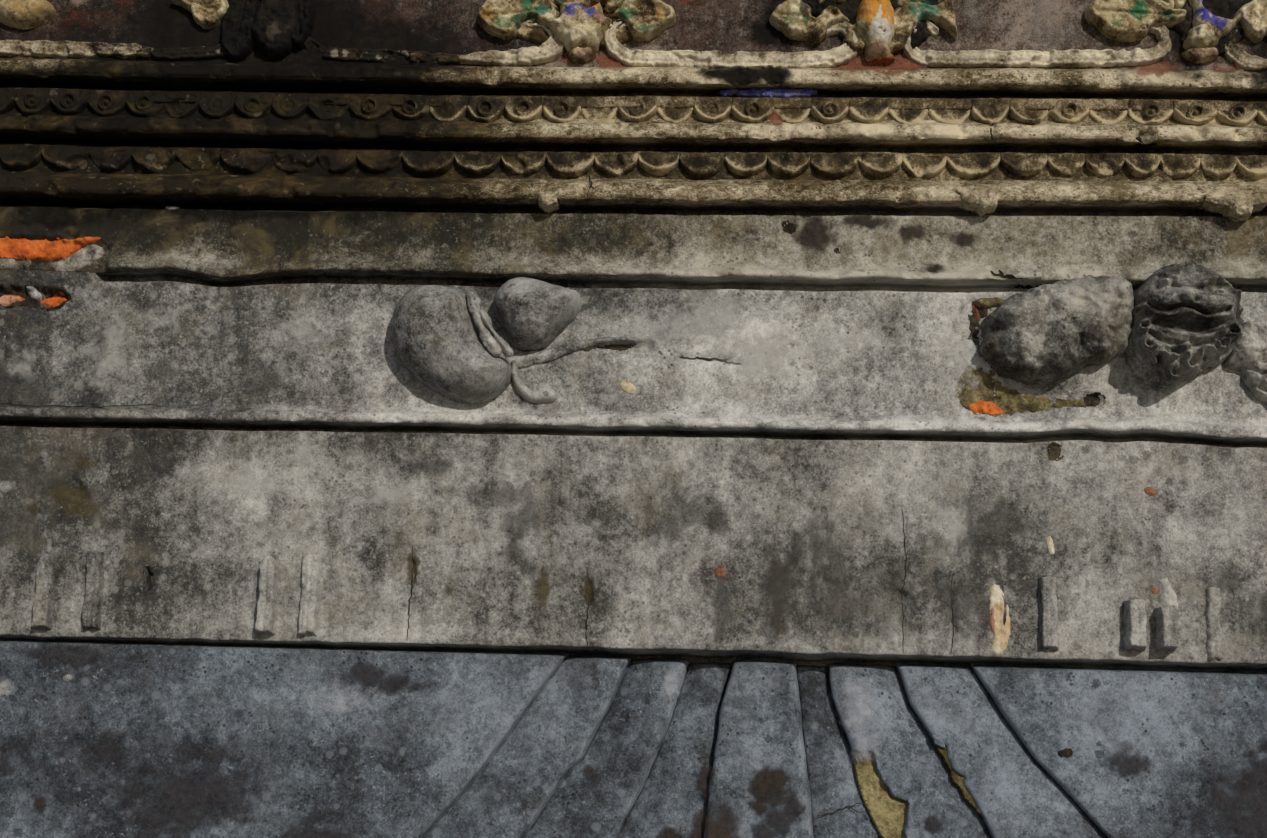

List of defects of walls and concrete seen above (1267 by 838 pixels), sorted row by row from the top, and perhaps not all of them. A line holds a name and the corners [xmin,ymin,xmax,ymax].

spalling [0,237,105,311]
leakage [125,735,263,838]
leakage [281,811,351,838]
spalling [851,749,907,838]
leakage [925,817,942,834]
spalling [930,734,982,815]
leakage [1112,748,1153,776]
leakage [1188,736,1267,838]